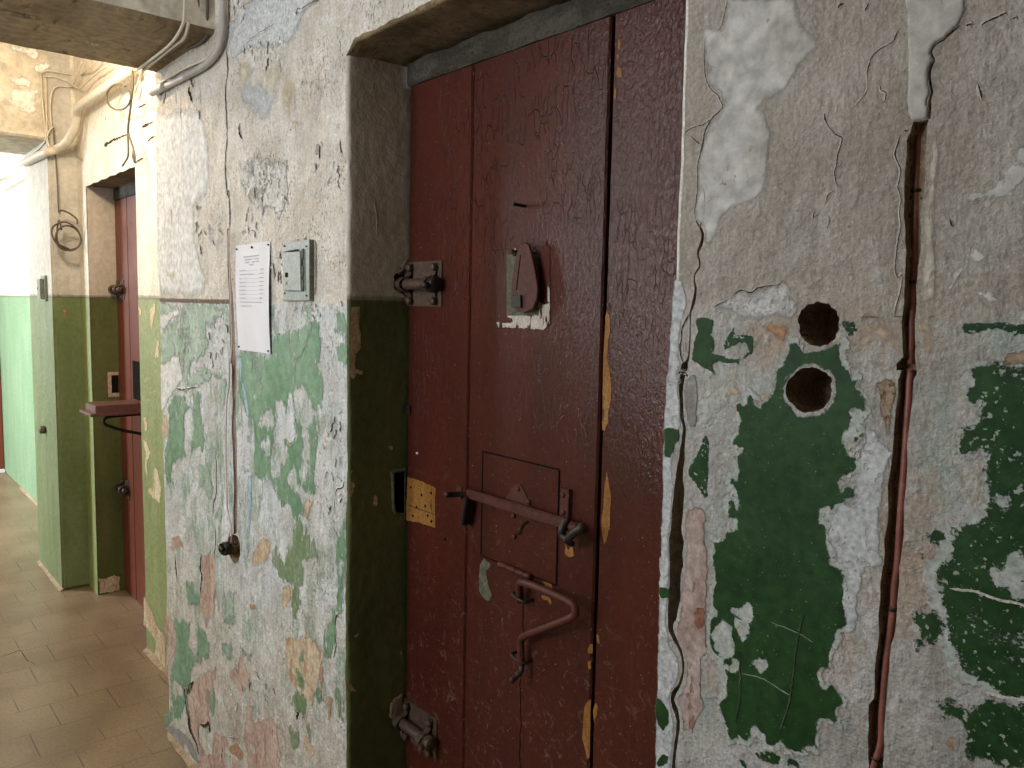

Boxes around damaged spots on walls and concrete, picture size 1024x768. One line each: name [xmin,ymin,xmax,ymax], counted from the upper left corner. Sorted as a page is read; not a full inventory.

crack [855,28,900,107]
crack [812,113,844,228]
crack [893,136,905,315]
crack [668,0,784,768]
spalling [876,378,896,434]
peeling [962,322,1024,336]
peeling [138,238,363,768]
peeling [406,477,436,528]
peeling [655,317,866,768]
peeling [911,350,1024,768]